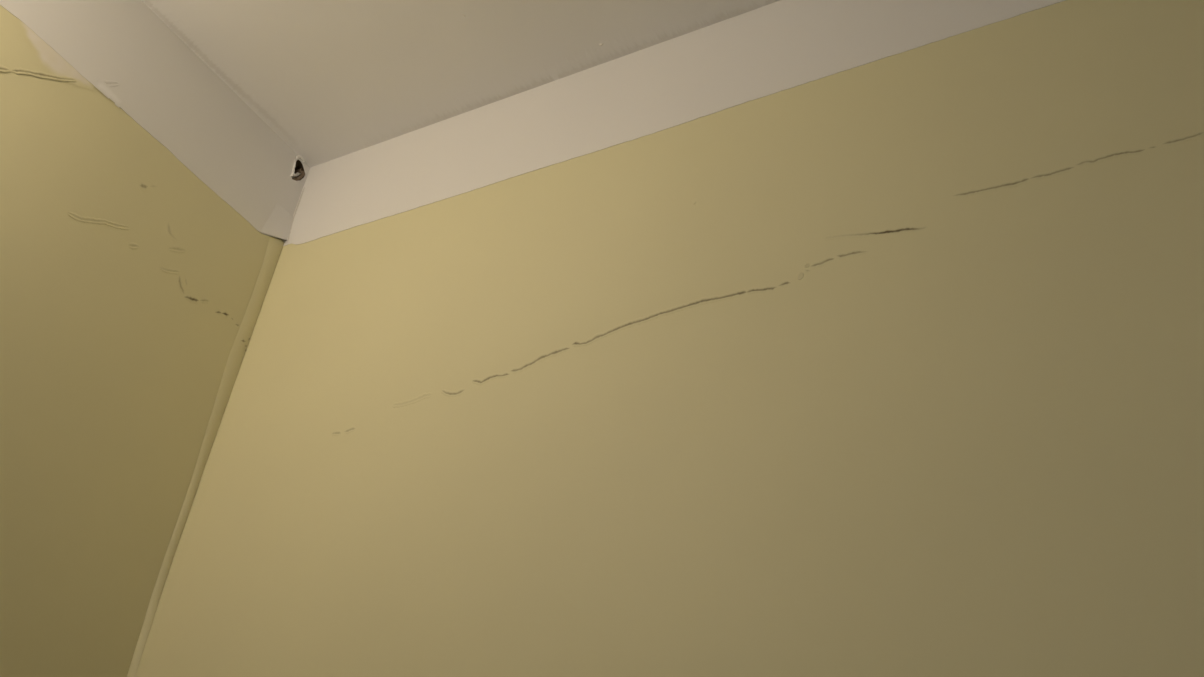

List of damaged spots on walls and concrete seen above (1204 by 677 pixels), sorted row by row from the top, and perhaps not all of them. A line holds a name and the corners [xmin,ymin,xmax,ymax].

crack [952,131,1204,198]
crack [392,225,928,408]